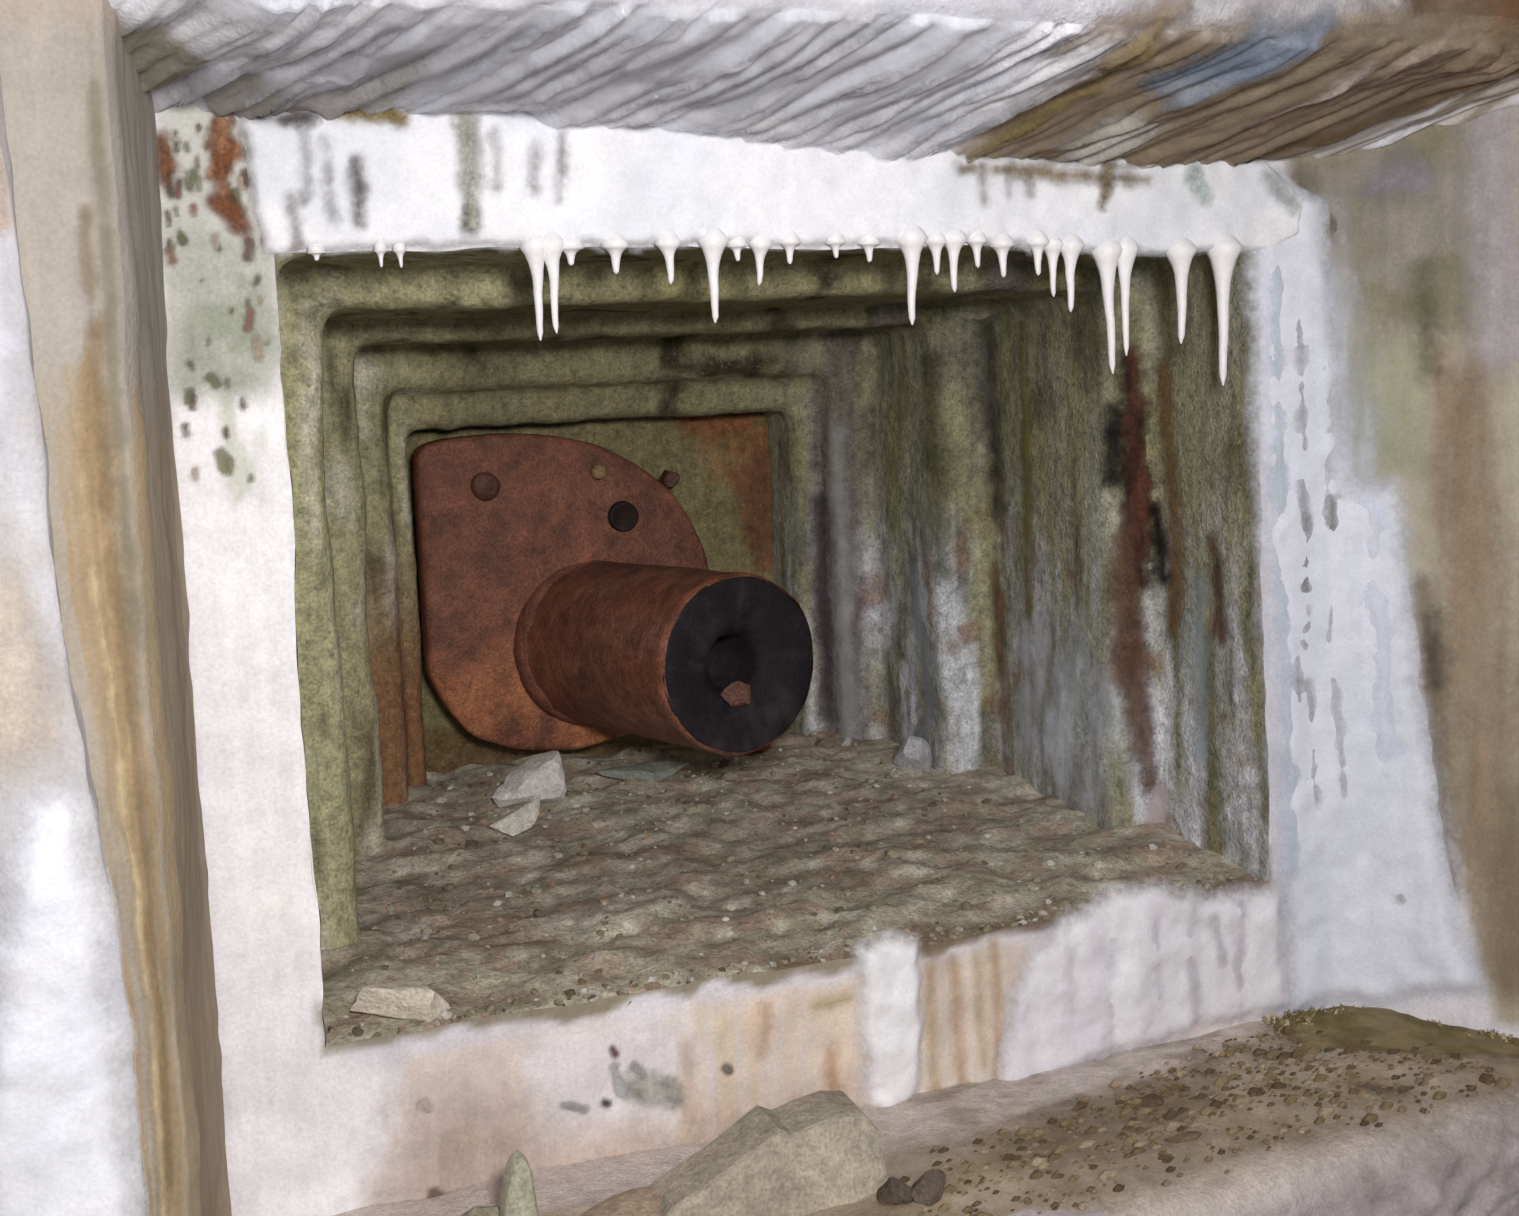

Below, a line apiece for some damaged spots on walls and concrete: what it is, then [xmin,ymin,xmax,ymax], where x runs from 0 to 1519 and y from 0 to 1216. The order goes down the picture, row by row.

water stain [68,325,184,1216]
corrosion [157,134,176,183]
corrosion [206,116,250,235]
corrosion [680,412,768,446]
water stain [815,428,856,737]
water stain [166,0,1519,559]
water stain [992,324,1108,791]
water stain [1276,556,1313,872]
water stain [1367,580,1394,757]